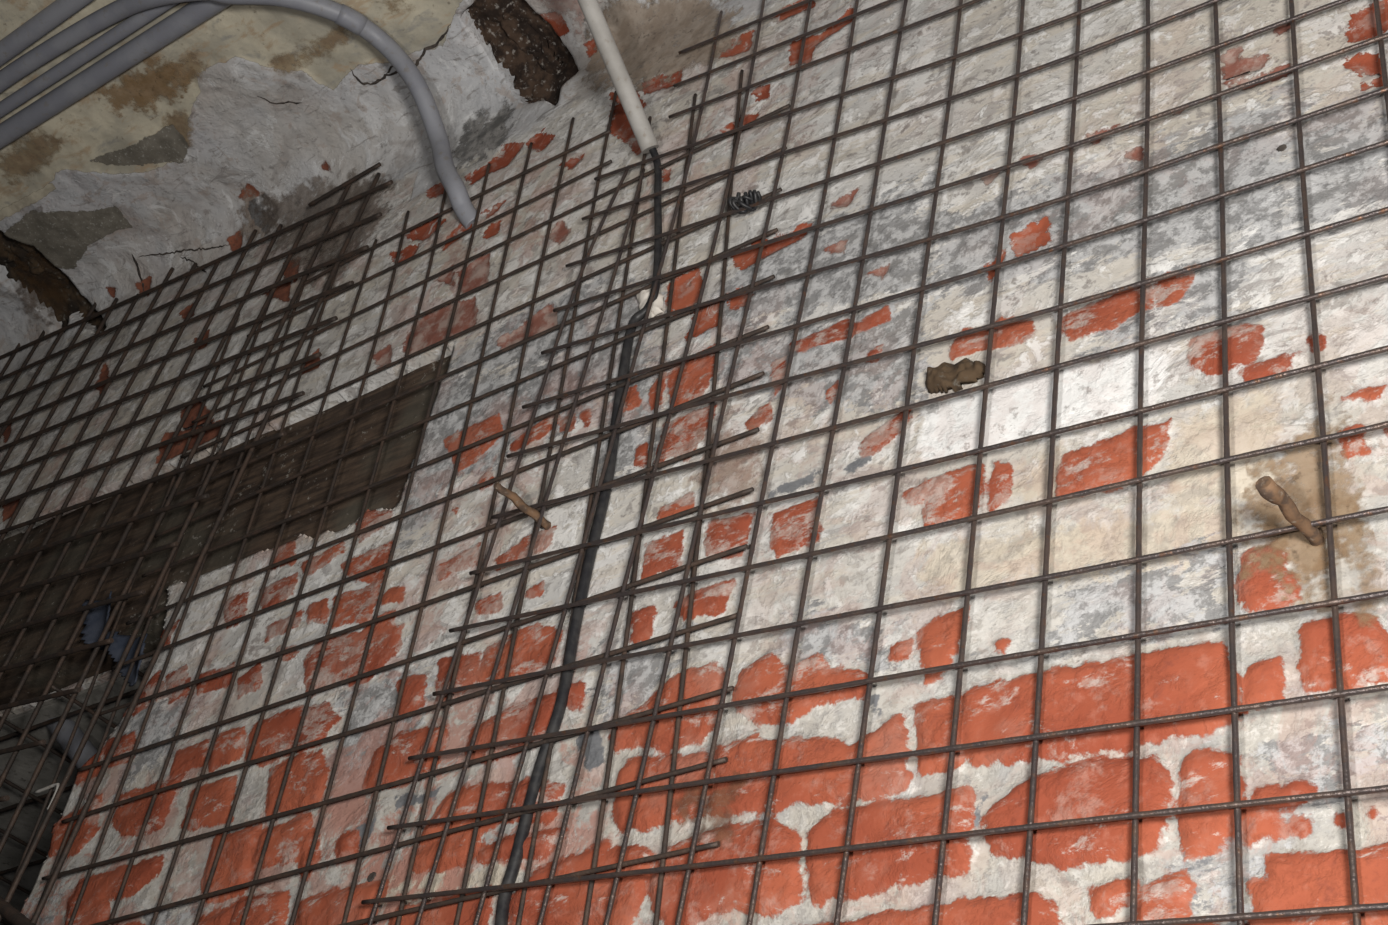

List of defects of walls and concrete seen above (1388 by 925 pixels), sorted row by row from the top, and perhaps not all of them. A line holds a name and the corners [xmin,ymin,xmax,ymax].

spalling [332,0,597,106]
peeling [788,5,854,66]
peeling [1220,46,1292,90]
peeling [1343,0,1388,91]
peeling [0,0,389,333]
peeling [464,127,556,186]
peeling [609,92,641,155]
peeling [372,183,506,369]
peeling [665,268,756,342]
peeling [731,222,812,270]
peeling [984,216,1052,282]
rust [1239,419,1383,624]